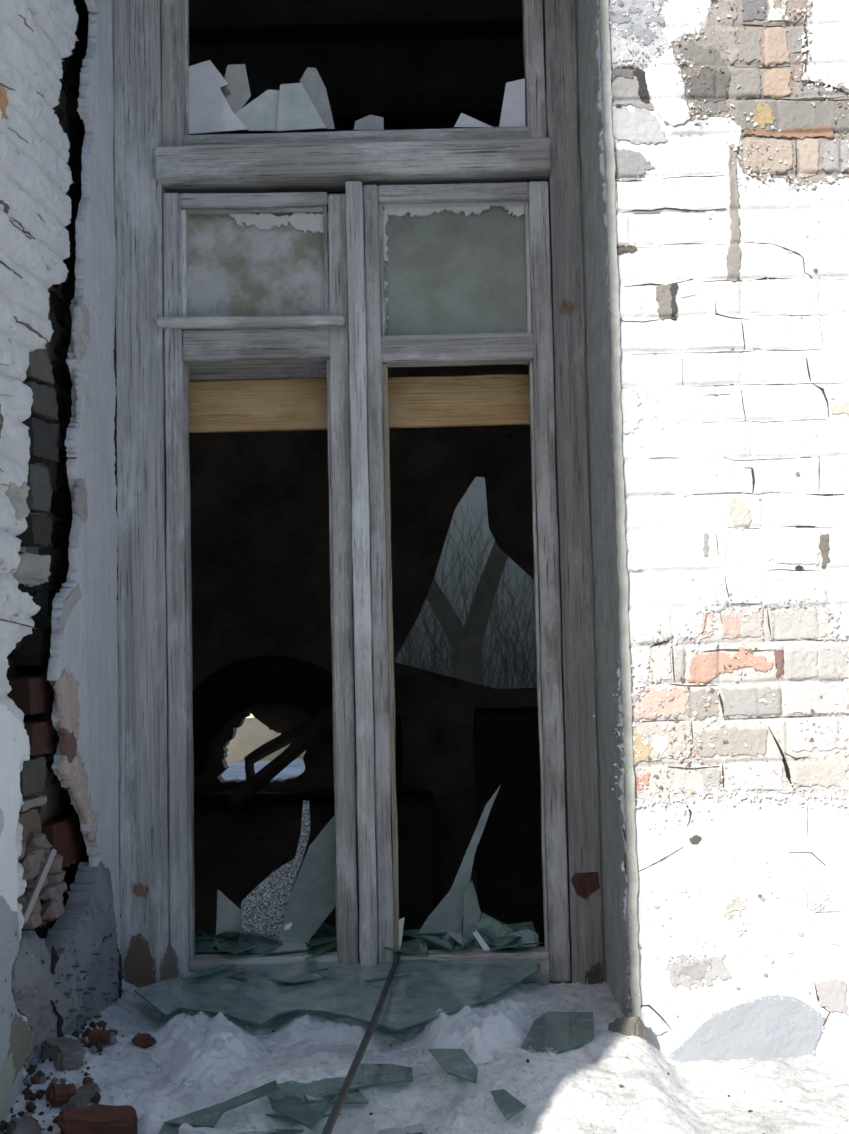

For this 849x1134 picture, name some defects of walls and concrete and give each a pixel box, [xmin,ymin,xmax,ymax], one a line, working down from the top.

crack [624,242,843,423]
crack [111,326,119,610]
flaking render [624,604,849,802]
spalling [26,875,123,1032]
crack [115,914,123,998]